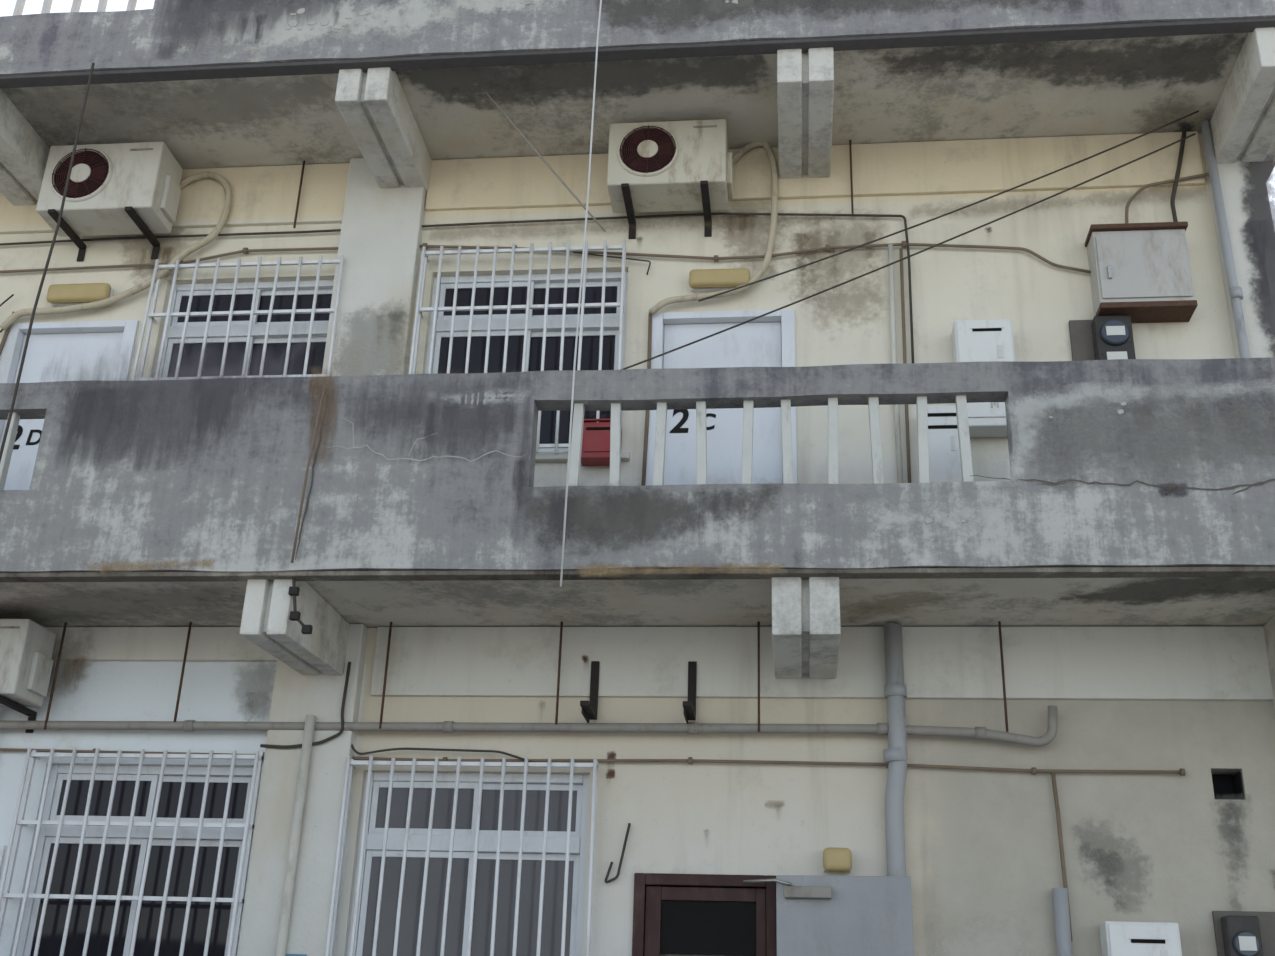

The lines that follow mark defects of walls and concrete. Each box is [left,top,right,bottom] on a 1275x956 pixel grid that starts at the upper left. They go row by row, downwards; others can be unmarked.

crack [971,475,1275,494]